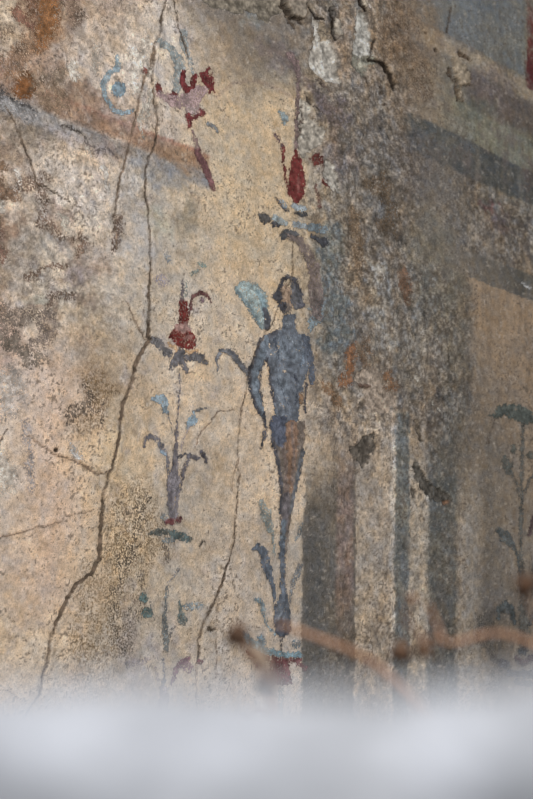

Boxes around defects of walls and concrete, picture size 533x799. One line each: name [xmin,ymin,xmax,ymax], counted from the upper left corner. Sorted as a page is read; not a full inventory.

spalling [308,18,344,91]
spalling [351,0,375,77]
flaking render [446,51,471,102]
crack [6,107,70,202]
spalling [296,93,325,158]
spalling [322,160,341,193]
crack [33,0,188,687]
crack [196,453,240,682]